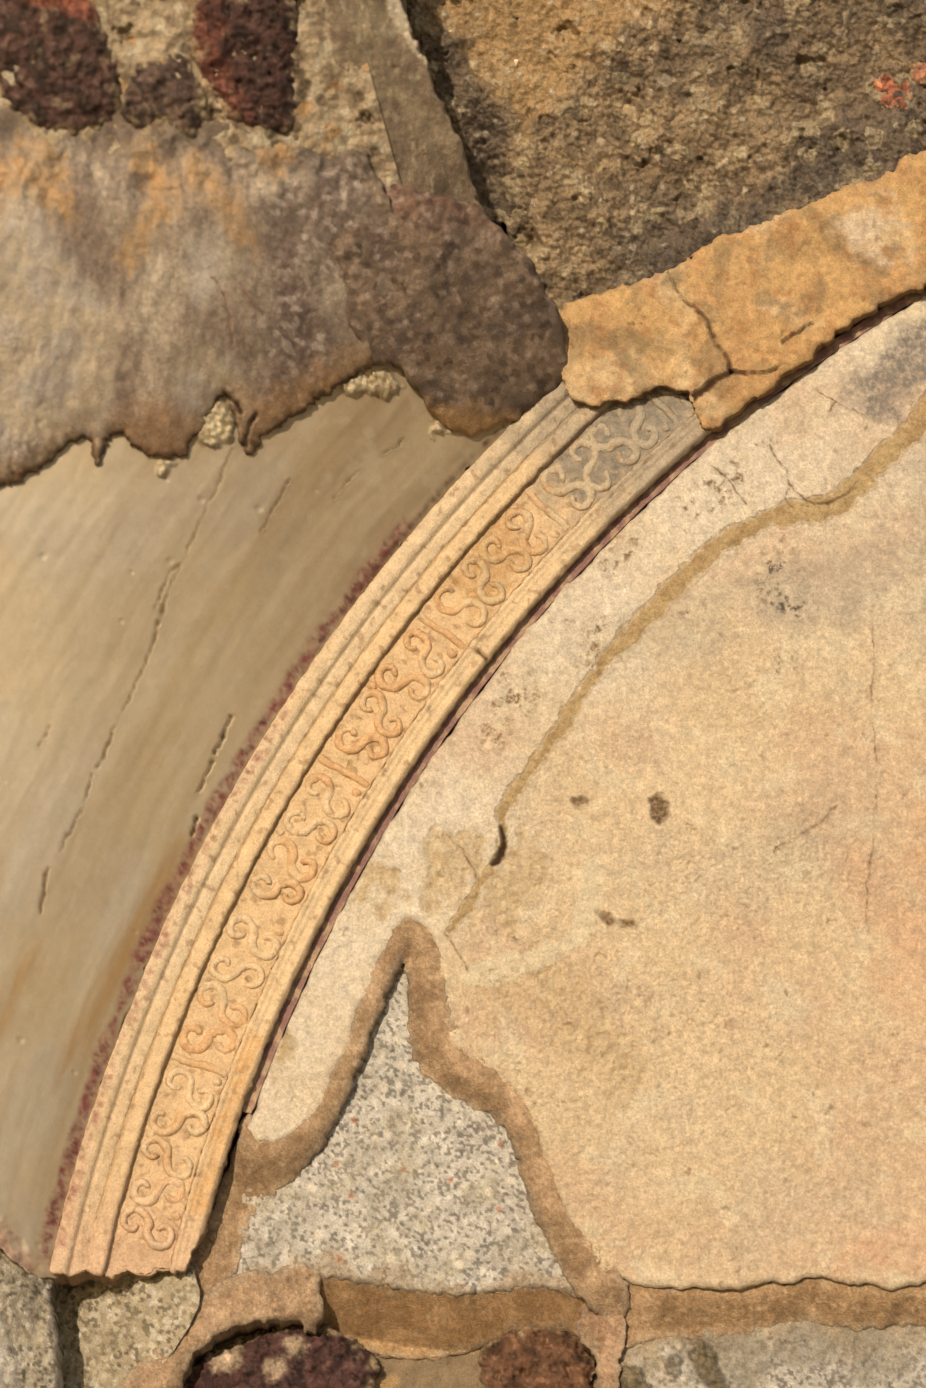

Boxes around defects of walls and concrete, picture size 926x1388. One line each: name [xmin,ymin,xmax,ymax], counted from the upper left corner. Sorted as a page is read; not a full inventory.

crack [664,270,815,404]
crack [443,388,926,973]